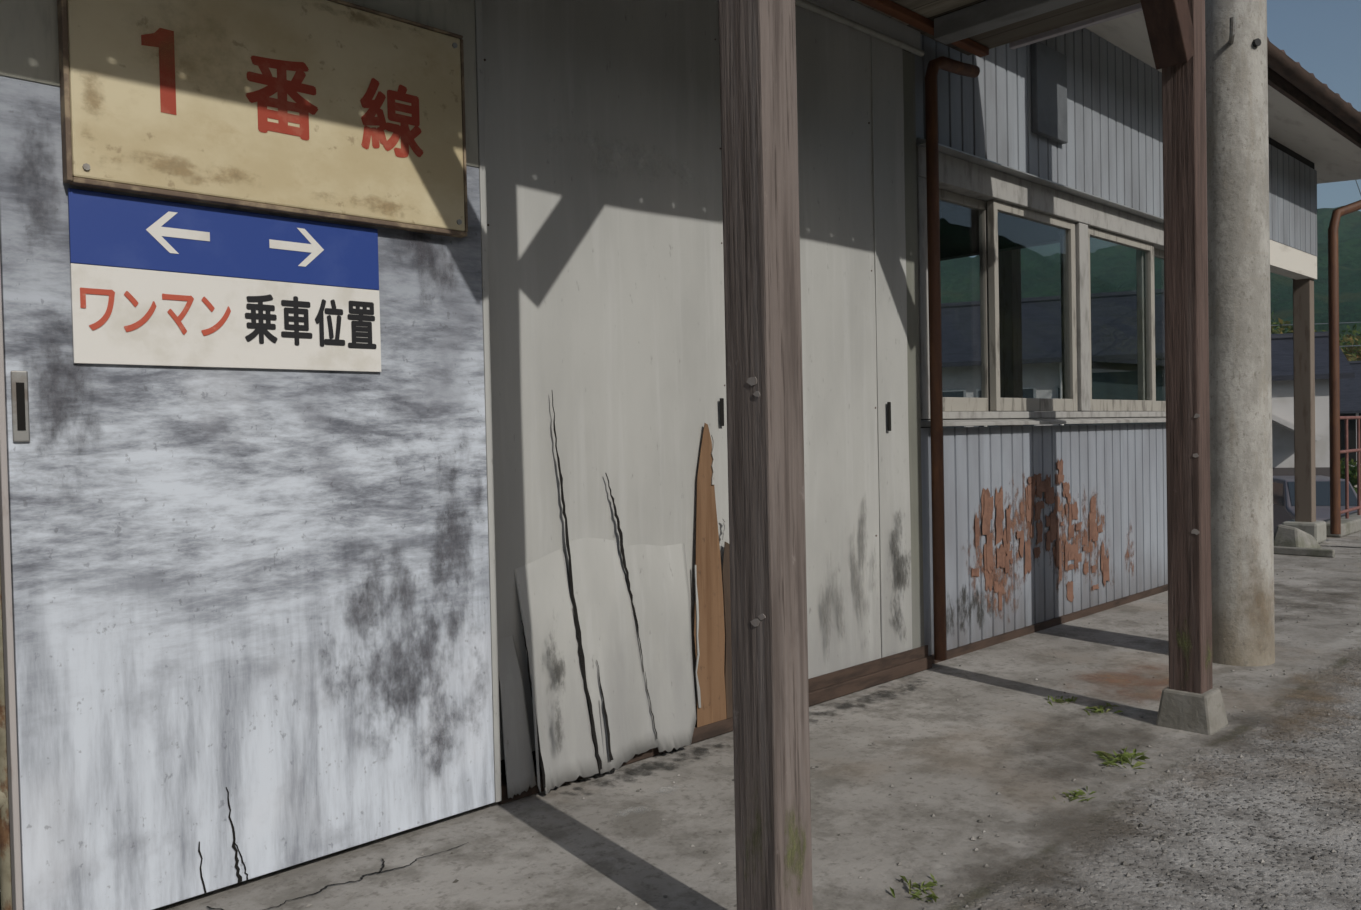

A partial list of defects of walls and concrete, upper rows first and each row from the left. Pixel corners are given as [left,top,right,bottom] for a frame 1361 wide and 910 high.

damp [352,577,412,626]
damp [355,635,433,706]
crack [521,620,546,788]
crack [552,392,614,770]
crack [605,473,657,739]
peeling [694,423,733,728]